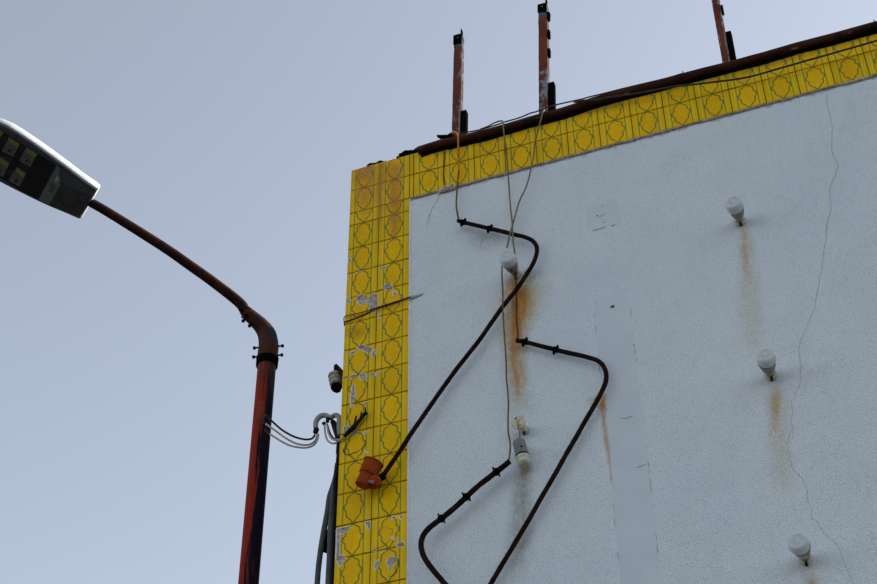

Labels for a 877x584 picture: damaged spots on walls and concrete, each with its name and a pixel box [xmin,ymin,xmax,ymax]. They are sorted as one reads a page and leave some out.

spalling [347,283,397,319]
corrosion [507,281,534,382]
spalling [344,344,377,365]
spalling [349,371,380,408]
spalling [335,525,350,568]
spalling [373,536,406,571]